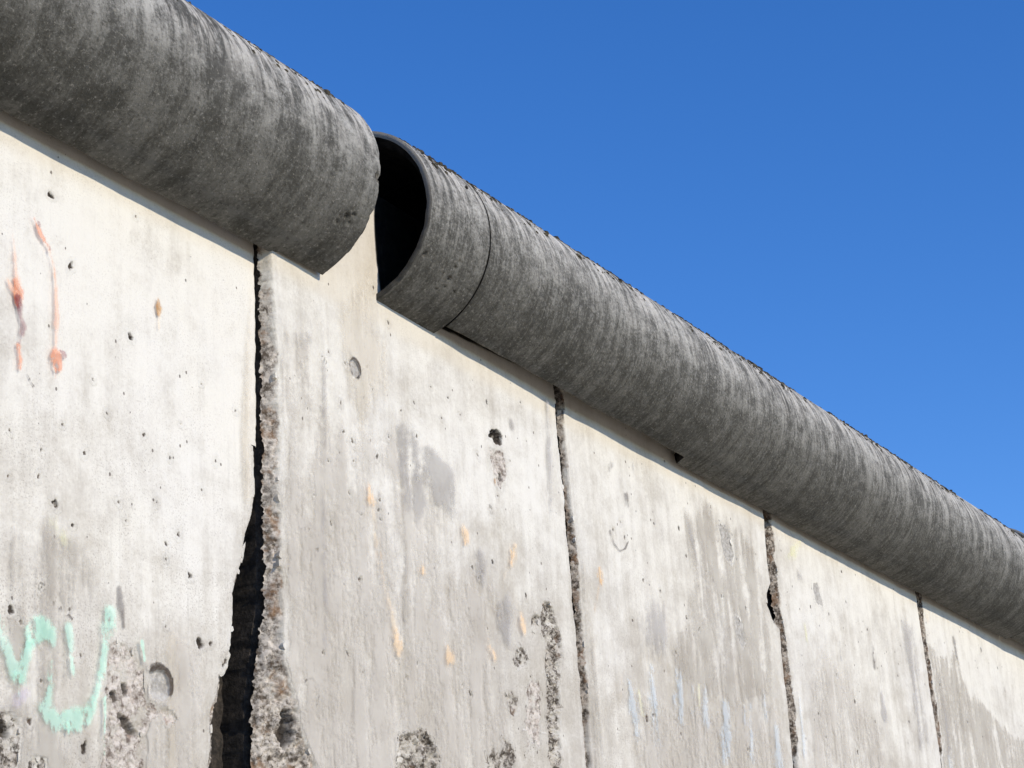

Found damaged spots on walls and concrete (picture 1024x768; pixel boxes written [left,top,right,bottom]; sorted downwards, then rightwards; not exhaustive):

spalling [484,384,597,768]
peeling [97,636,180,768]
spalling [393,725,441,768]